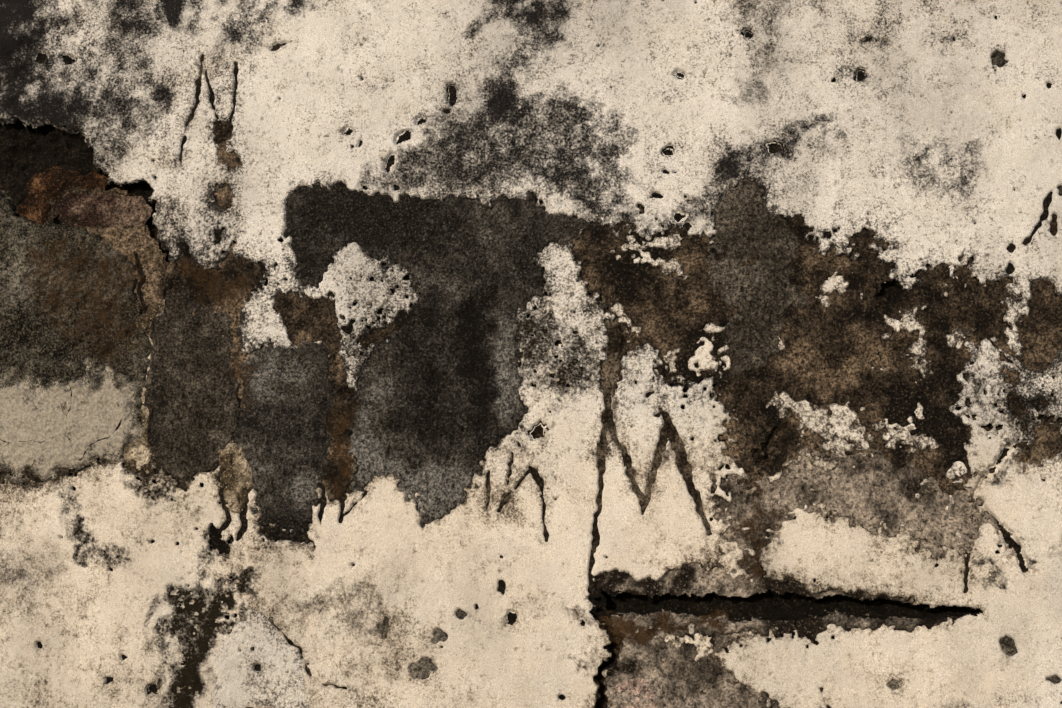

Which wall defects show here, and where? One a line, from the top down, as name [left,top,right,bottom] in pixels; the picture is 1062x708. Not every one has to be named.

leakage [216,0,314,58]
leakage [0,0,203,166]
leakage [361,0,846,237]
flaking render [0,118,1062,603]
leakage [146,585,172,689]
leakage [197,546,214,593]
spalling [409,657,438,680]
spalling [431,628,448,648]
spalling [505,611,518,626]
flaking render [596,609,964,708]
crack [588,585,983,708]
spalling [999,635,1018,657]